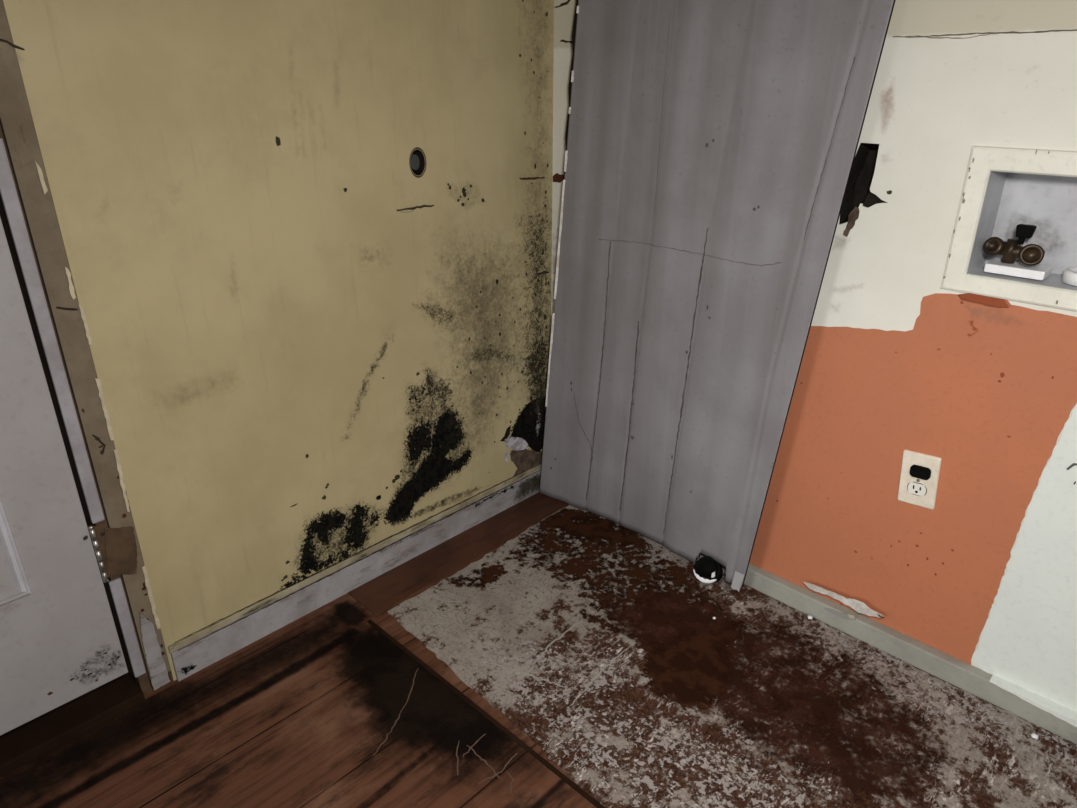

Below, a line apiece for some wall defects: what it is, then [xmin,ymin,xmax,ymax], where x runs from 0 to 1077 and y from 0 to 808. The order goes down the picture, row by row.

spalling [839,143,892,237]
damp [468,191,551,422]
damp [276,369,541,593]